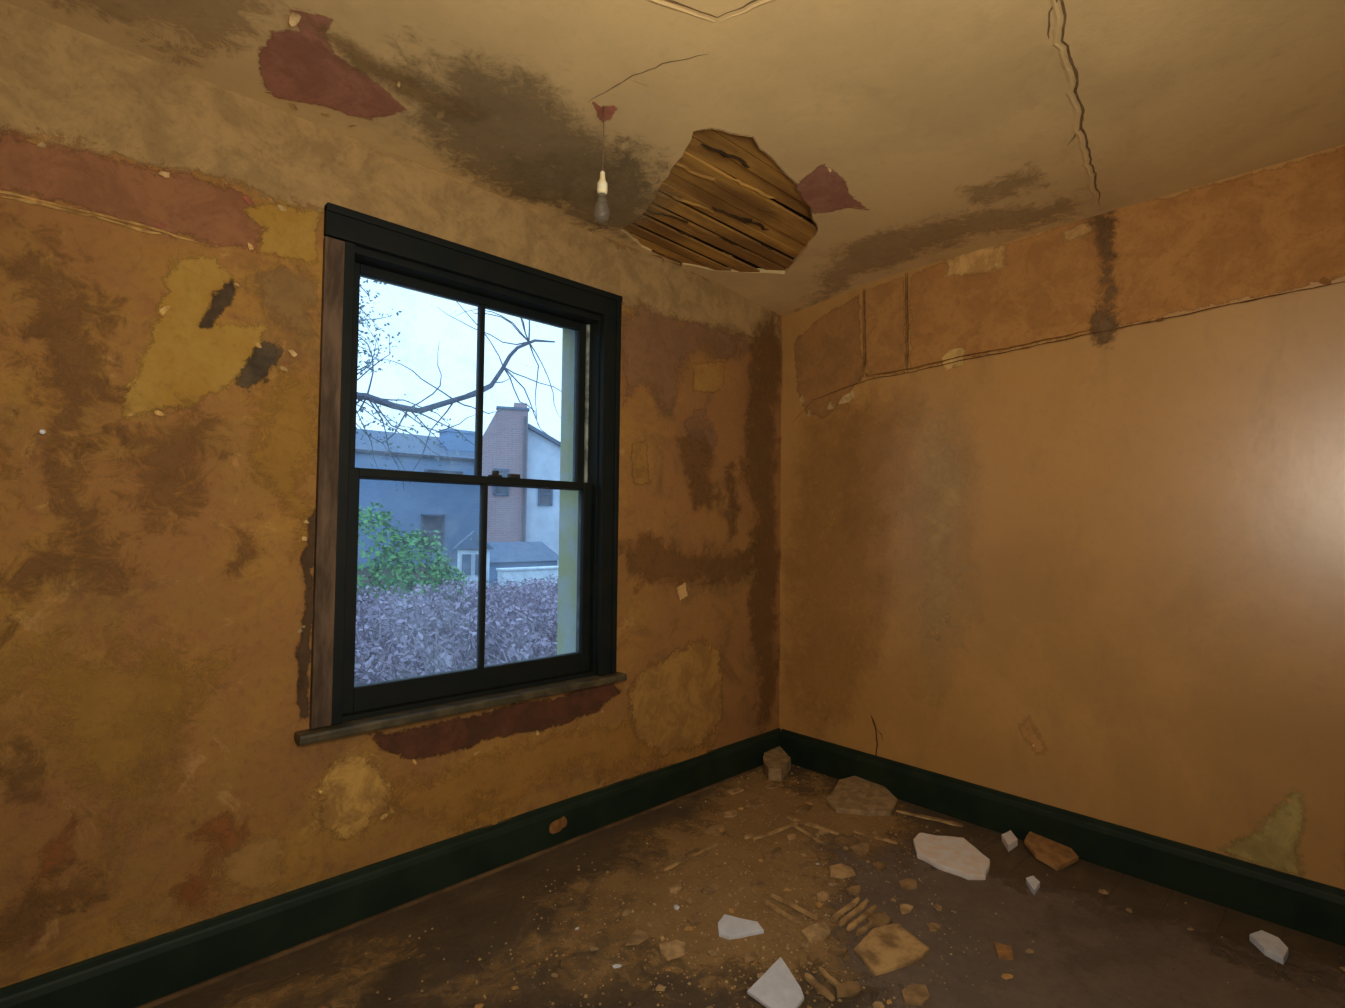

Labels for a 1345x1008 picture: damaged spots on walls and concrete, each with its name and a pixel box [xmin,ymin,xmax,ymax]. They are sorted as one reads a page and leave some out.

peeling [0,0,869,343]
damp [397,56,663,229]
crack [587,54,706,103]
crack [646,0,775,23]
crack [1047,0,1101,207]
damp [0,237,135,597]
spalling [236,341,297,392]
damp [618,312,783,734]
spalling [369,683,622,765]